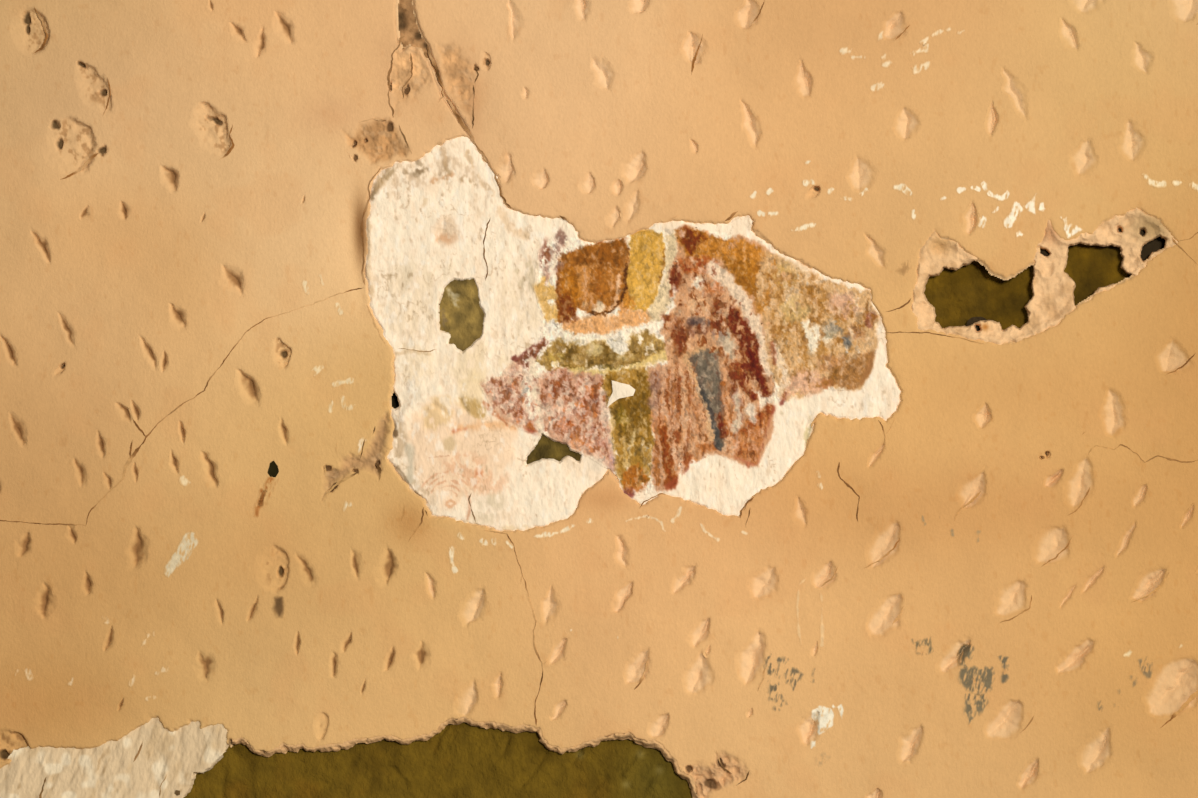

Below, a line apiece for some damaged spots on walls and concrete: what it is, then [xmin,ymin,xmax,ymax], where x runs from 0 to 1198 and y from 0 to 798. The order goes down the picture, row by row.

crack [387,0,569,222]
peeling [870,30,893,92]
crack [0,168,386,526]
flaking render [319,40,901,574]
flaking render [911,180,1178,345]
crack [486,530,548,724]
flaking render [0,717,752,798]